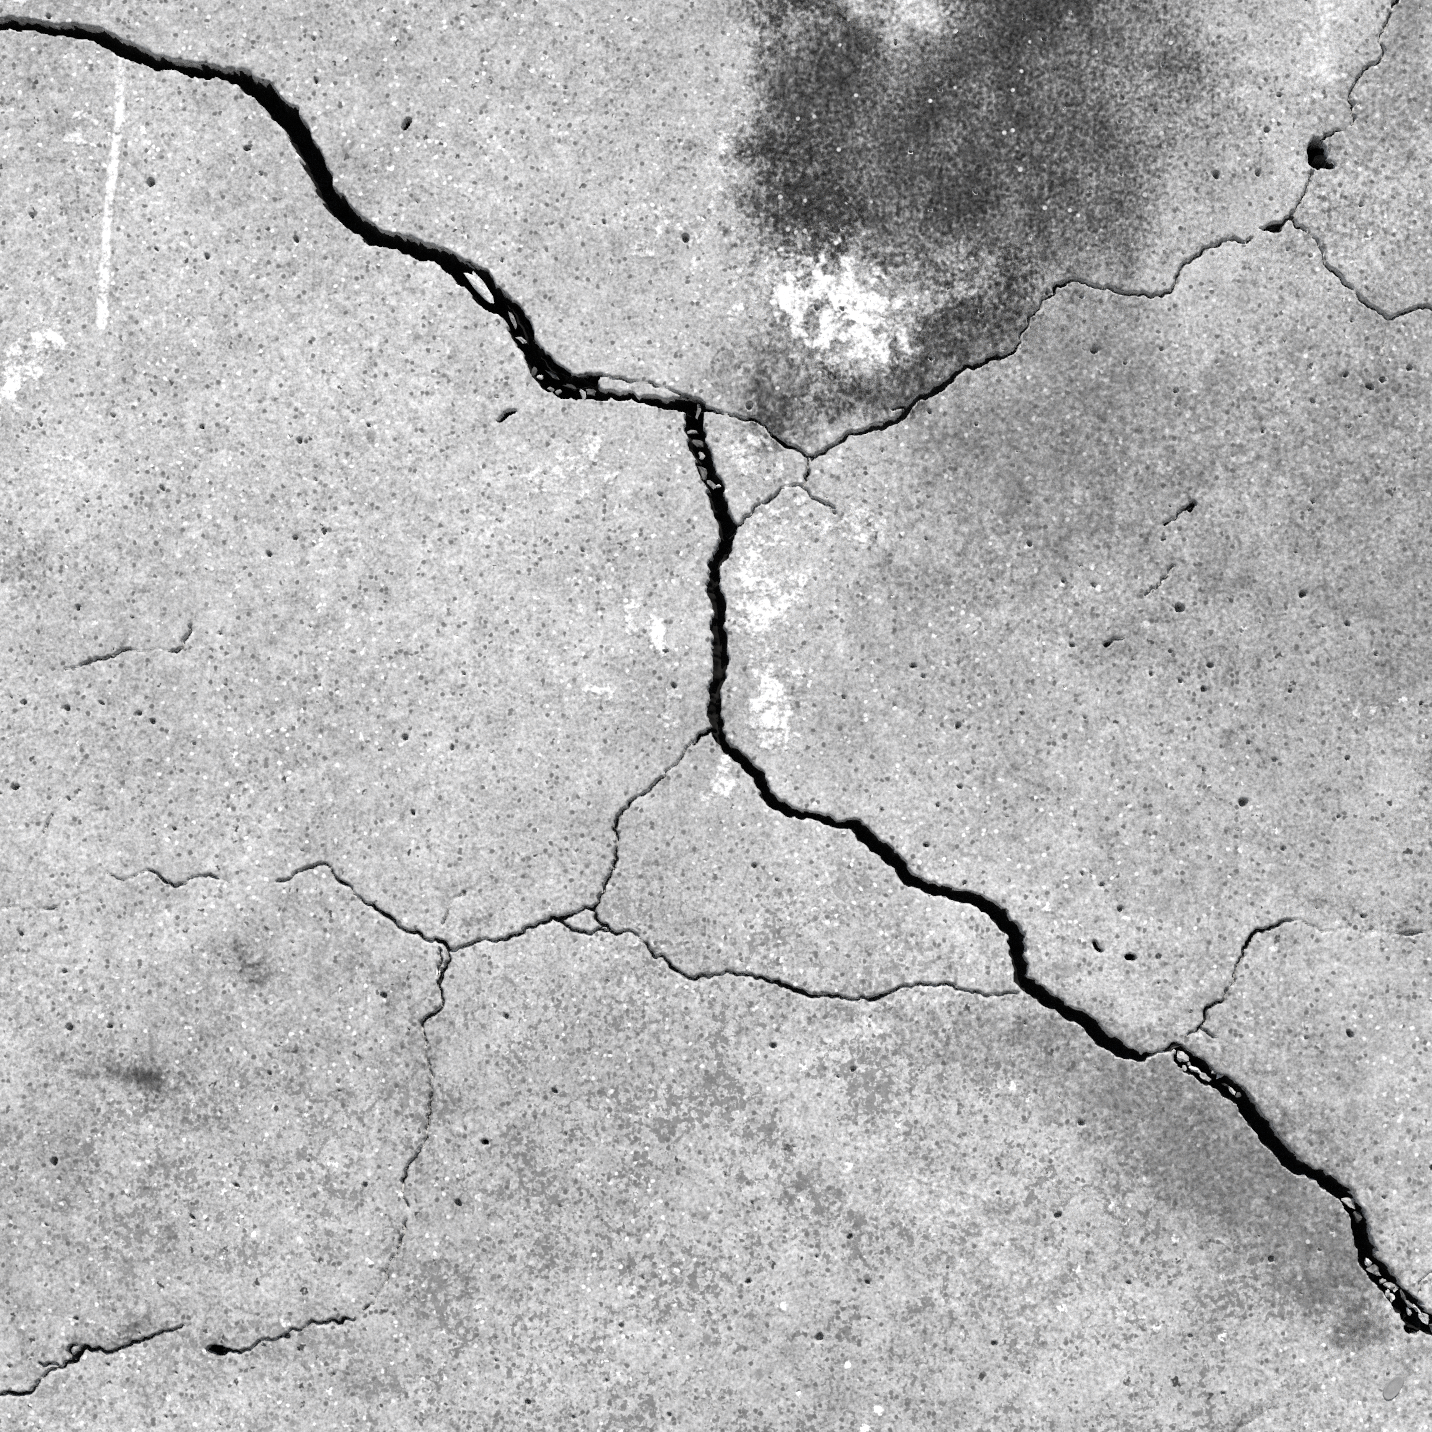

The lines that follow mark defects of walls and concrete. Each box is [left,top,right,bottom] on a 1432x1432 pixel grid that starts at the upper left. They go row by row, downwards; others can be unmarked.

leakage [1304,0,1344,83]
leakage [633,205,704,256]
leakage [709,0,1244,522]
crack [738,0,1399,507]
efflorescence [526,437,602,497]
crack [0,20,1155,1062]
efflorescence [625,600,666,656]
efflorescence [583,680,644,702]
crack [280,778,958,1183]
crack [1232,921,1285,978]
crack [1163,1042,1432,1335]
crack [1,1325,183,1395]